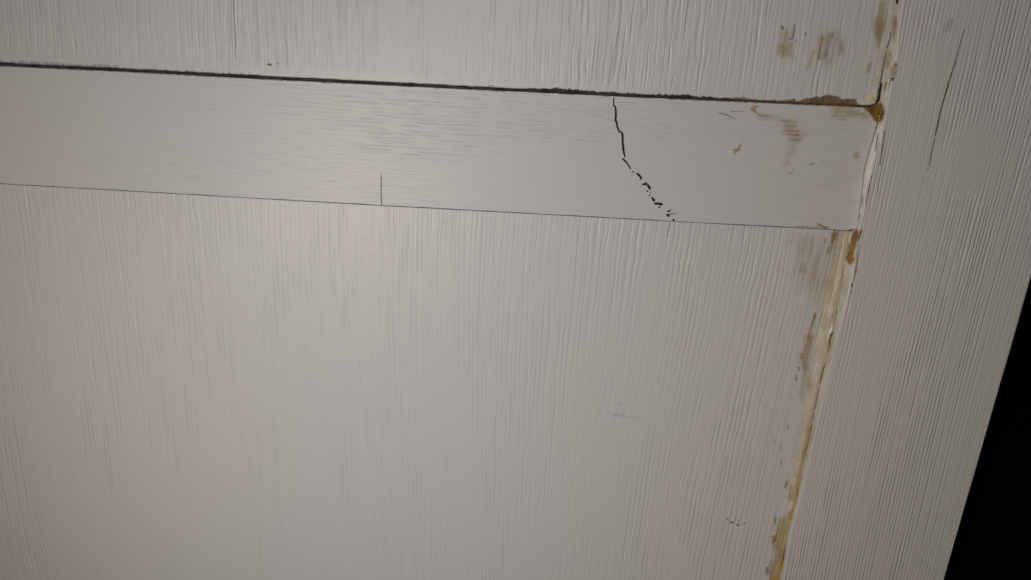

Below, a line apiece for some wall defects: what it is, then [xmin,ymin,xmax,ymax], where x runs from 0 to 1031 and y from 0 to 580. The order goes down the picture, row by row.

peeling [857,31,896,105]
crack [613,98,676,234]
peeling [789,232,852,511]